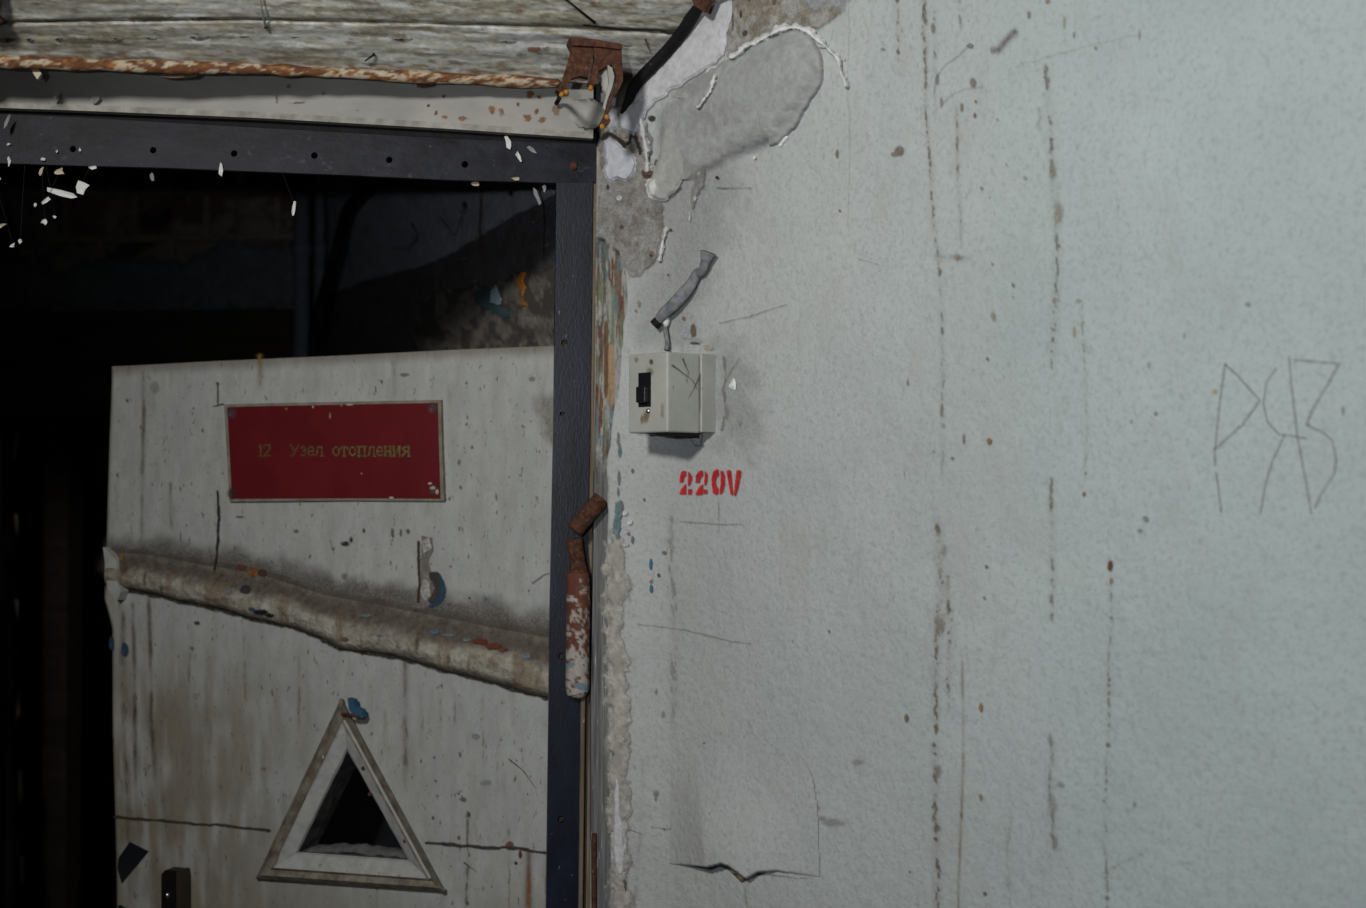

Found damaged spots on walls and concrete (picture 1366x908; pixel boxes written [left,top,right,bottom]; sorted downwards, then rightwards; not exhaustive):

corrosion [0,55,569,122]
flaking render [707,0,849,88]
flaking render [325,136,556,356]
flaking render [596,99,751,908]